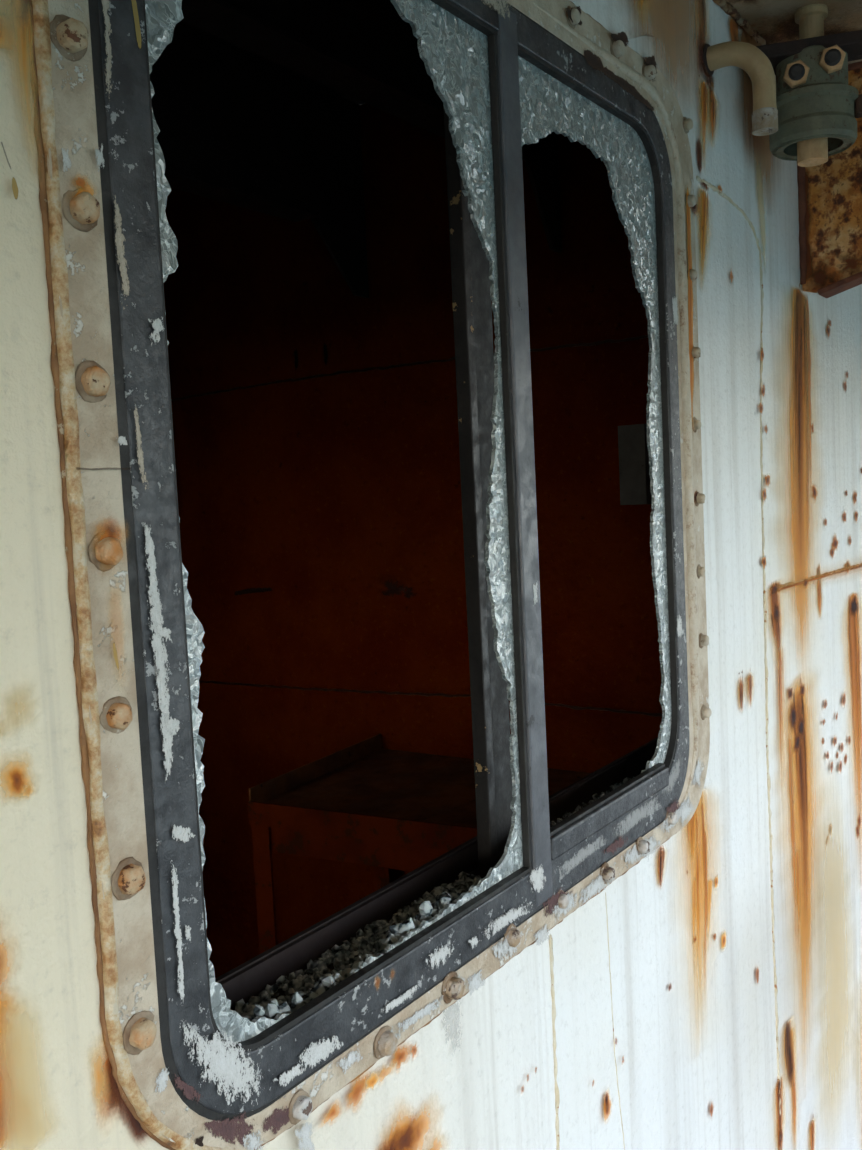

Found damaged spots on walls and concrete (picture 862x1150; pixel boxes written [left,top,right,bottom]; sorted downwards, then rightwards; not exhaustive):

peeling [142,522,180,780]
corrosion [771,169,862,1004]
corrosion [1,762,32,796]
peeling [170,860,191,1006]
peeling [172,824,195,843]
corrosion [687,792,726,972]
peeling [391,970,485,1039]
corrosion [0,1001,43,1148]
peeling [155,1022,363,1150]
corrosion [324,1044,417,1123]
corrosion [384,1111,441,1150]
corrosion [777,1021,796,1150]